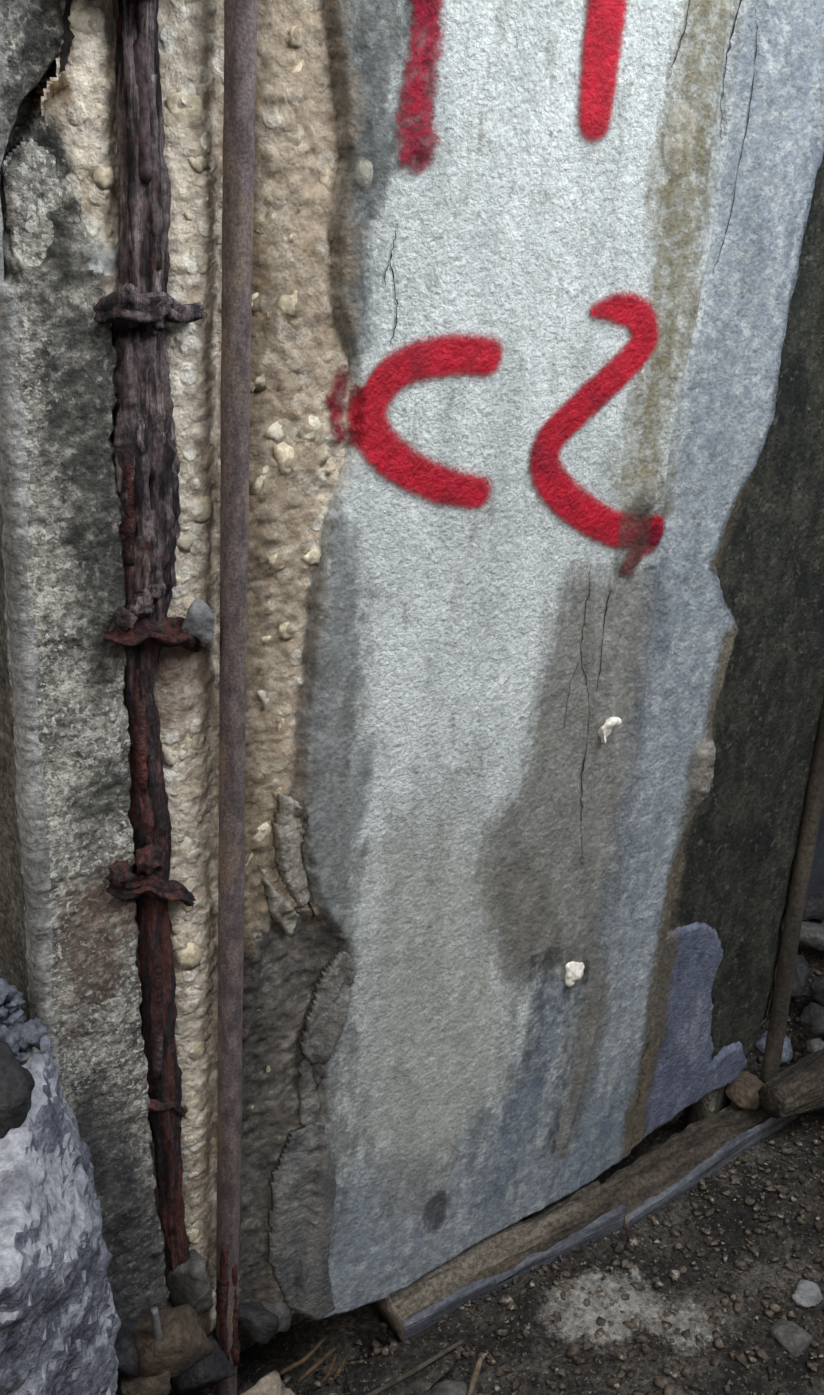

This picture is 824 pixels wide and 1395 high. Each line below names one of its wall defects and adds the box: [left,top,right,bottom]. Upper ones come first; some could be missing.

crack [0,0,75,213]
spalling [0,0,120,297]
corrosion [133,3,164,270]
corrosion [113,337,131,418]
corrosion [118,428,169,566]
corrosion [131,669,155,846]
spalling [153,0,224,1336]
spalling [240,0,356,1321]
damp [238,0,824,1319]
corrosion [150,943,164,1081]
spalling [149,1122,159,1215]